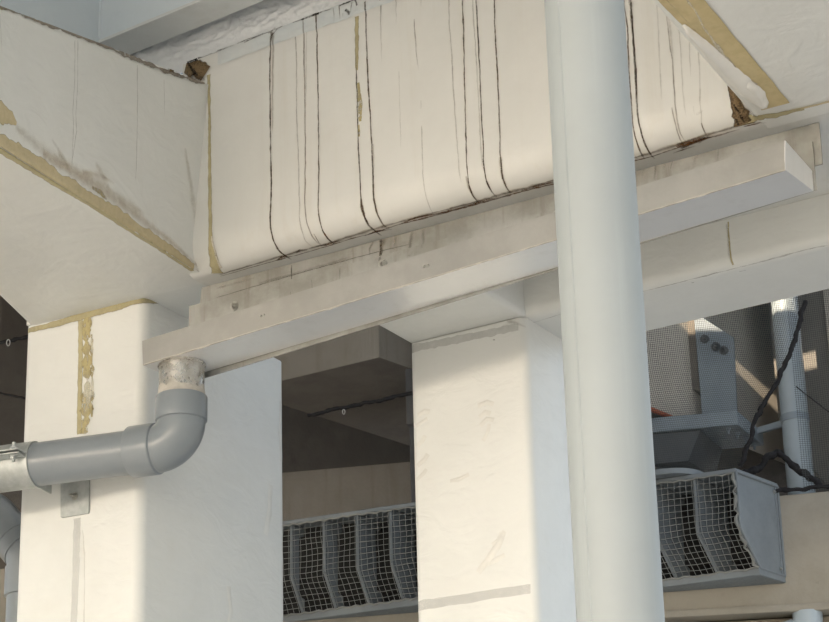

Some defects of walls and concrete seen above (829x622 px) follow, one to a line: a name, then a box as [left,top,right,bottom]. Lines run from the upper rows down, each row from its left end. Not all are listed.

peeling [658,0,829,127]
peeling [0,6,223,274]
peeling [28,298,156,435]